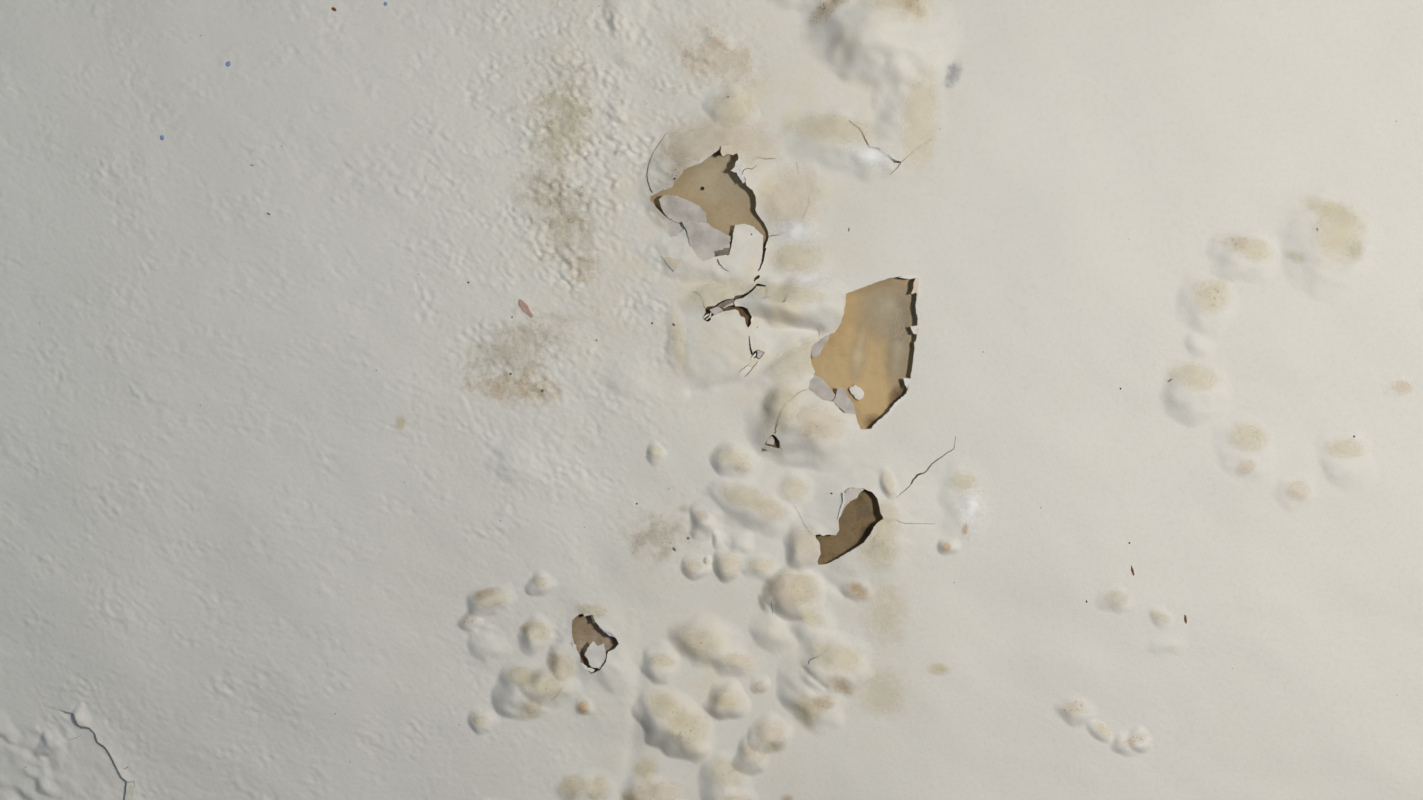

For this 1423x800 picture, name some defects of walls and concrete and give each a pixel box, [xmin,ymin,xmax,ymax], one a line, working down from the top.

peeling [640,109,786,261]
peeling [808,275,919,429]
peeling [801,450,943,581]
peeling [556,591,643,682]
crack [69,714,136,800]